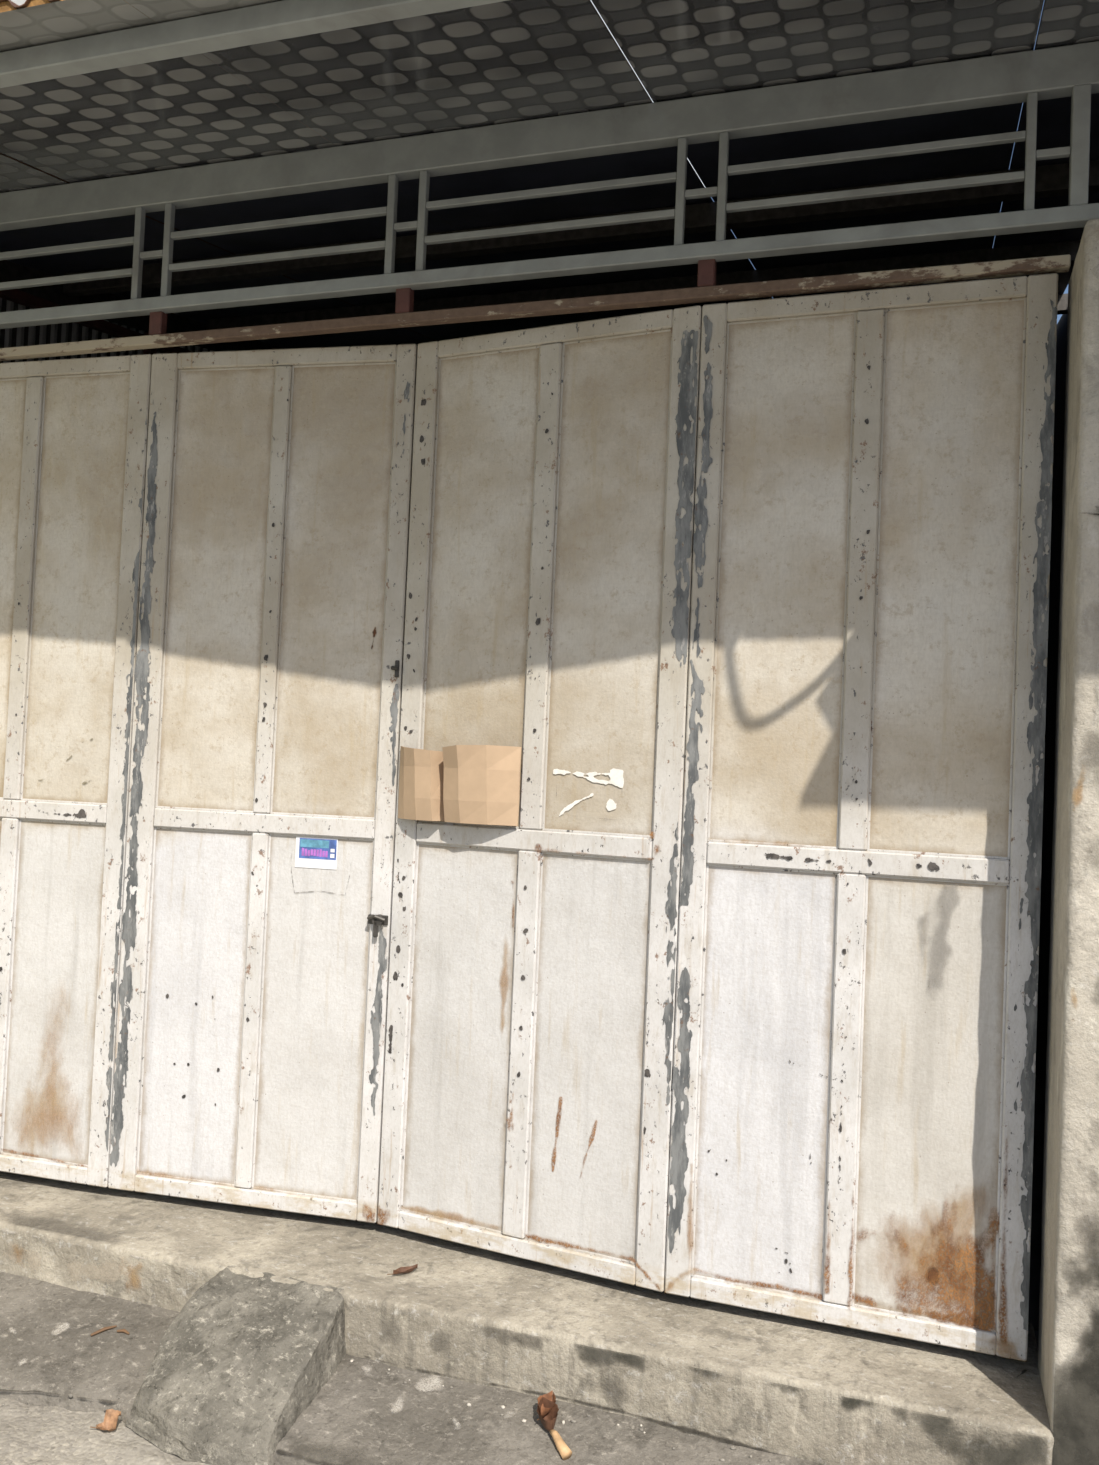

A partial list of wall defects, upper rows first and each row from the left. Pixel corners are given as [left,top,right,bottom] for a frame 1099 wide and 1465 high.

peeling [105,402,158,1167]
rust [552,1097,562,1172]
peeling [645,315,713,1253]
rust [898,1209,1015,1356]
peeling [1014,299,1057,1331]